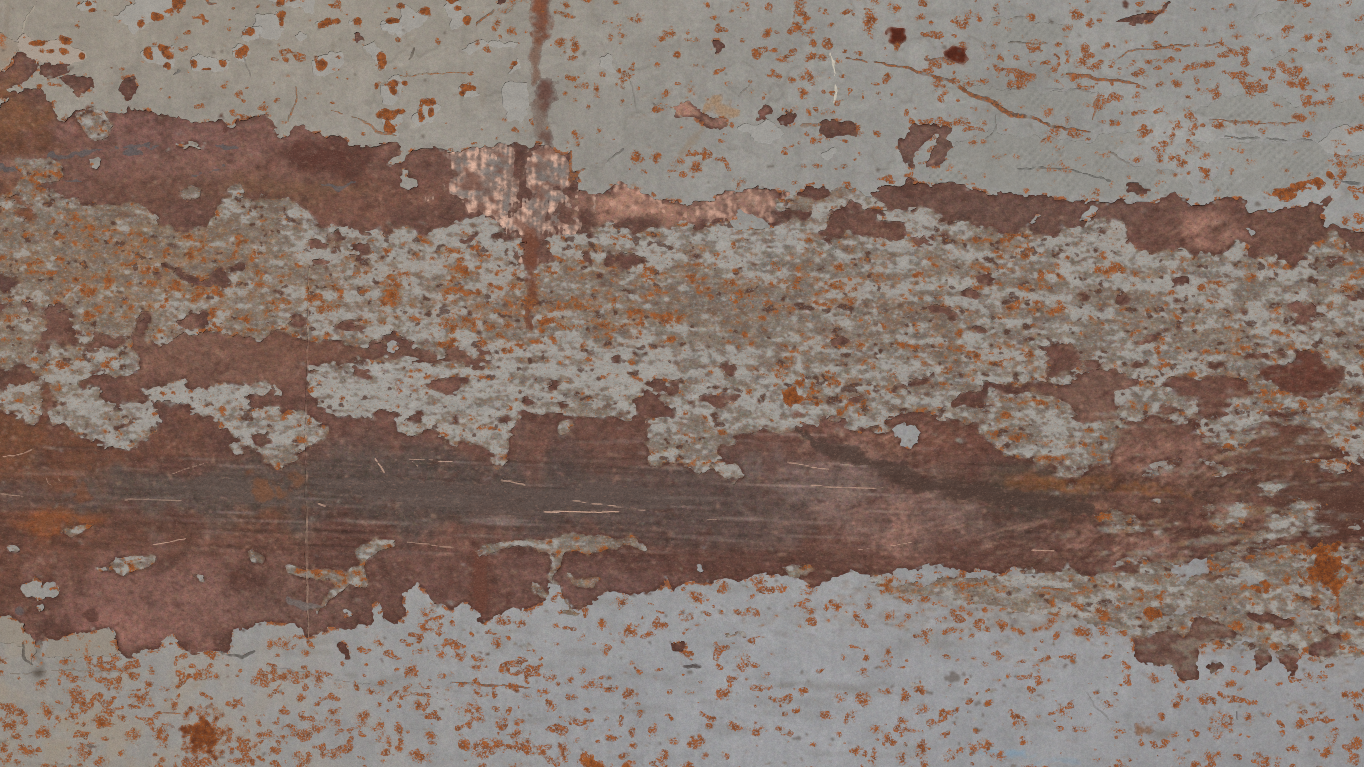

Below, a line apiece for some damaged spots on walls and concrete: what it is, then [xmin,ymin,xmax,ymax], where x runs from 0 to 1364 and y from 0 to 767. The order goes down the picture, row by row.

rust [861,0,906,48]
rust [527,0,559,150]
rust [943,45,975,88]
rust [1268,171,1335,202]
peeling [0,33,1364,484]
rust [778,373,824,408]
peeling [0,364,1364,681]
rust [1297,539,1359,626]
rust [0,672,257,767]
rust [309,707,439,764]
rust [458,715,636,767]
rust [895,737,995,767]